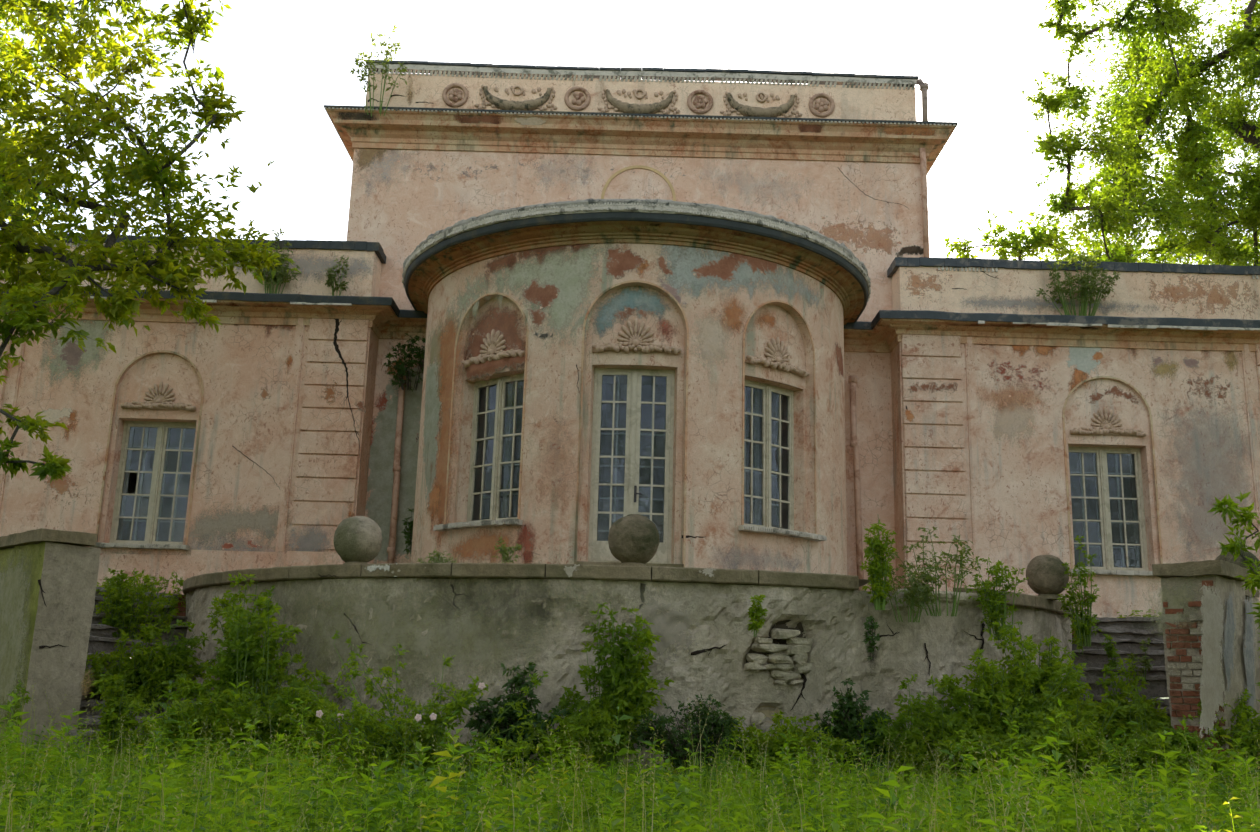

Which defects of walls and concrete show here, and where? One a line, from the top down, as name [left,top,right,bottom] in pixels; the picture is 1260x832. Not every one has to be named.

peeling [605,245,687,307]
peeling [692,252,782,282]
crack [333,319,361,470]
peeling [989,347,1104,400]
peeling [1088,386,1140,407]
peeling [1183,357,1241,407]
flaking render [629,588,702,665]
spalling [744,620,813,685]
flaking render [1163,580,1256,755]